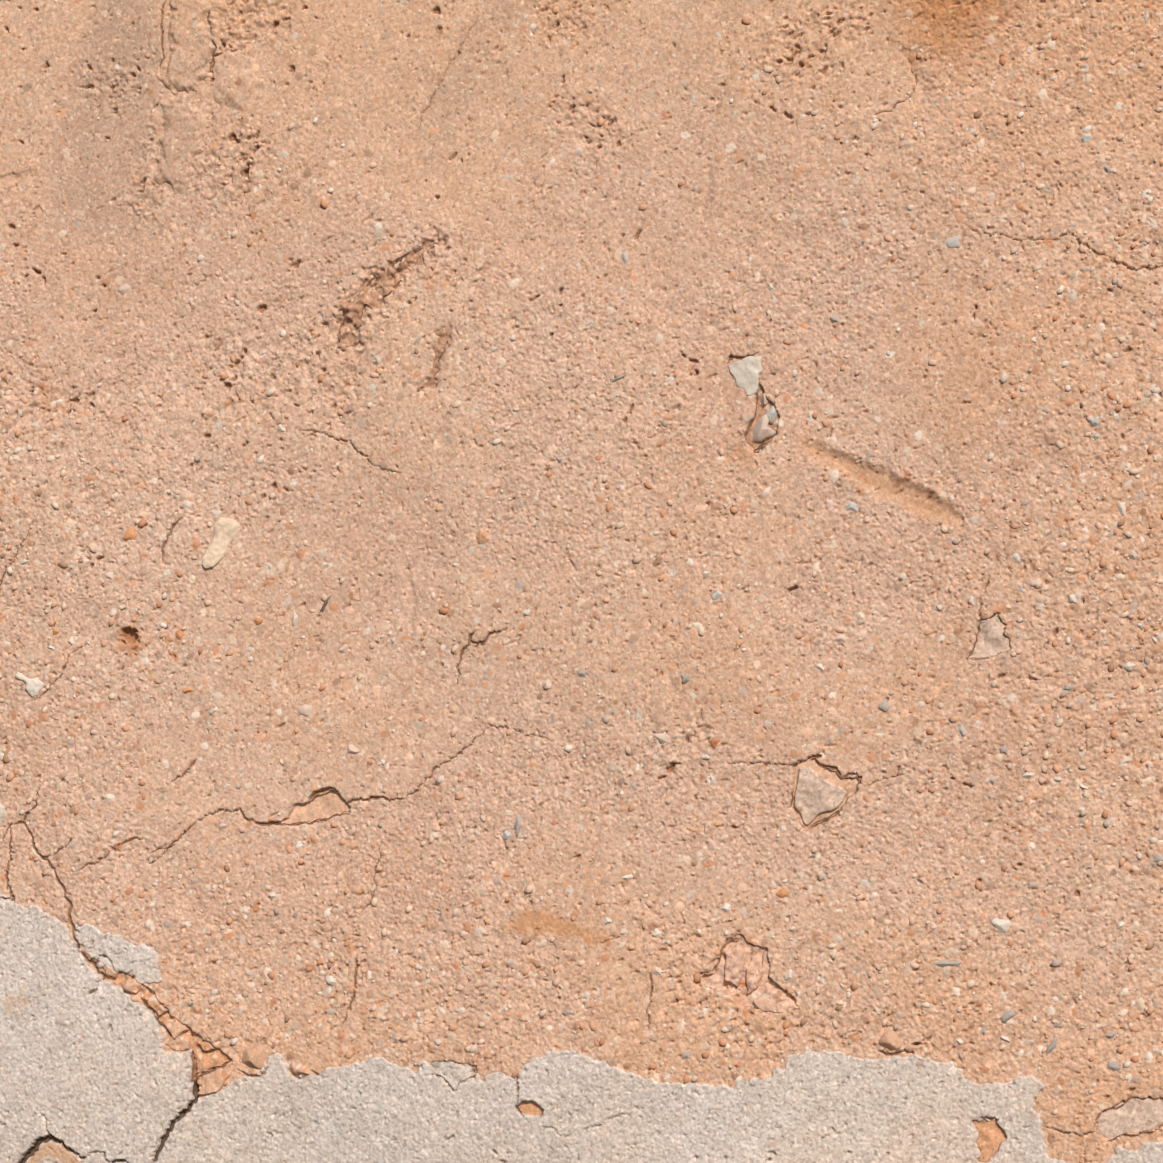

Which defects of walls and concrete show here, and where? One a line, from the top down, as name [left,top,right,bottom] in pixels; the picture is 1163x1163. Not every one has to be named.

spalling [727,354,779,452]
crack [456,628,508,684]
crack [347,725,546,803]
spalling [785,755,861,831]
crack [3,787,278,993]
spalling [95,955,232,1081]
crack [342,959,358,1024]
spalling [700,935,799,1013]
crack [20,1079,199,1163]
spalling [515,1076,543,1117]
peeling [973,1117,1006,1162]
spalling [1043,1088,1163,1141]